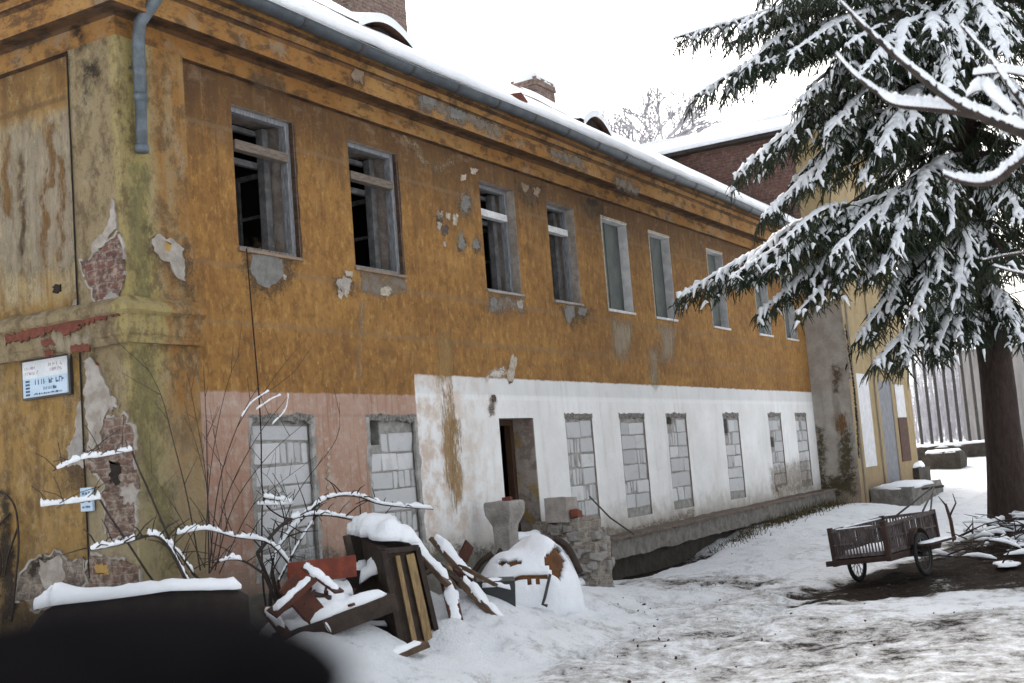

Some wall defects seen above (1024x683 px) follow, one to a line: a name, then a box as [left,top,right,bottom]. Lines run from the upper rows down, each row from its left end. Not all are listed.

water stain [0,113,75,281]
peeling [78,198,127,302]
peeling [148,230,193,295]
peeling [333,270,406,300]
peeling [436,211,459,247]
peeling [486,354,517,384]
spalling [5,313,141,542]
spalling [15,548,143,609]